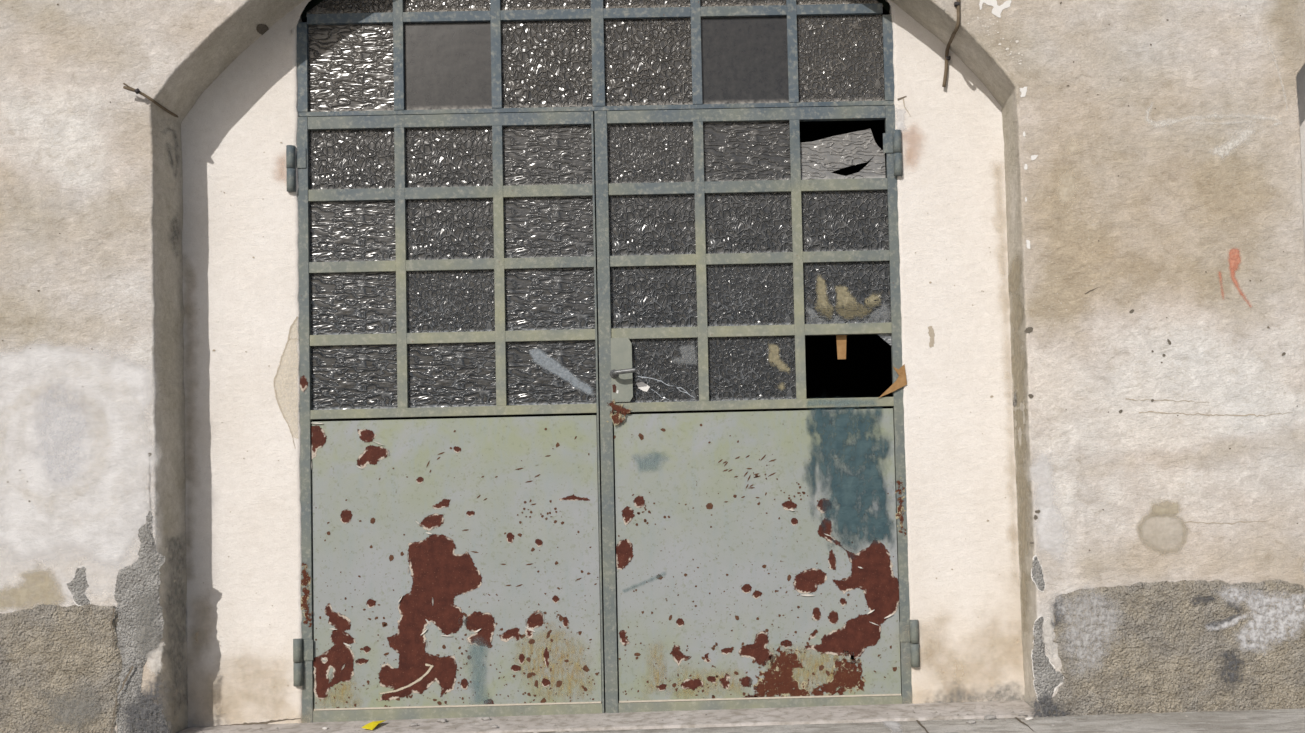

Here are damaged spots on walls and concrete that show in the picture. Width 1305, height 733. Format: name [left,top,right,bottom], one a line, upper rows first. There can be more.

corrosion [311,423,327,470]
corrosion [356,429,390,469]
corrosion [895,477,906,536]
water stain [0,571,61,608]
spalling [66,565,91,606]
spalling [114,508,170,733]
corrosion [301,499,583,702]
corrosion [655,498,899,700]
spalling [1030,542,1069,717]
spalling [1207,614,1246,630]